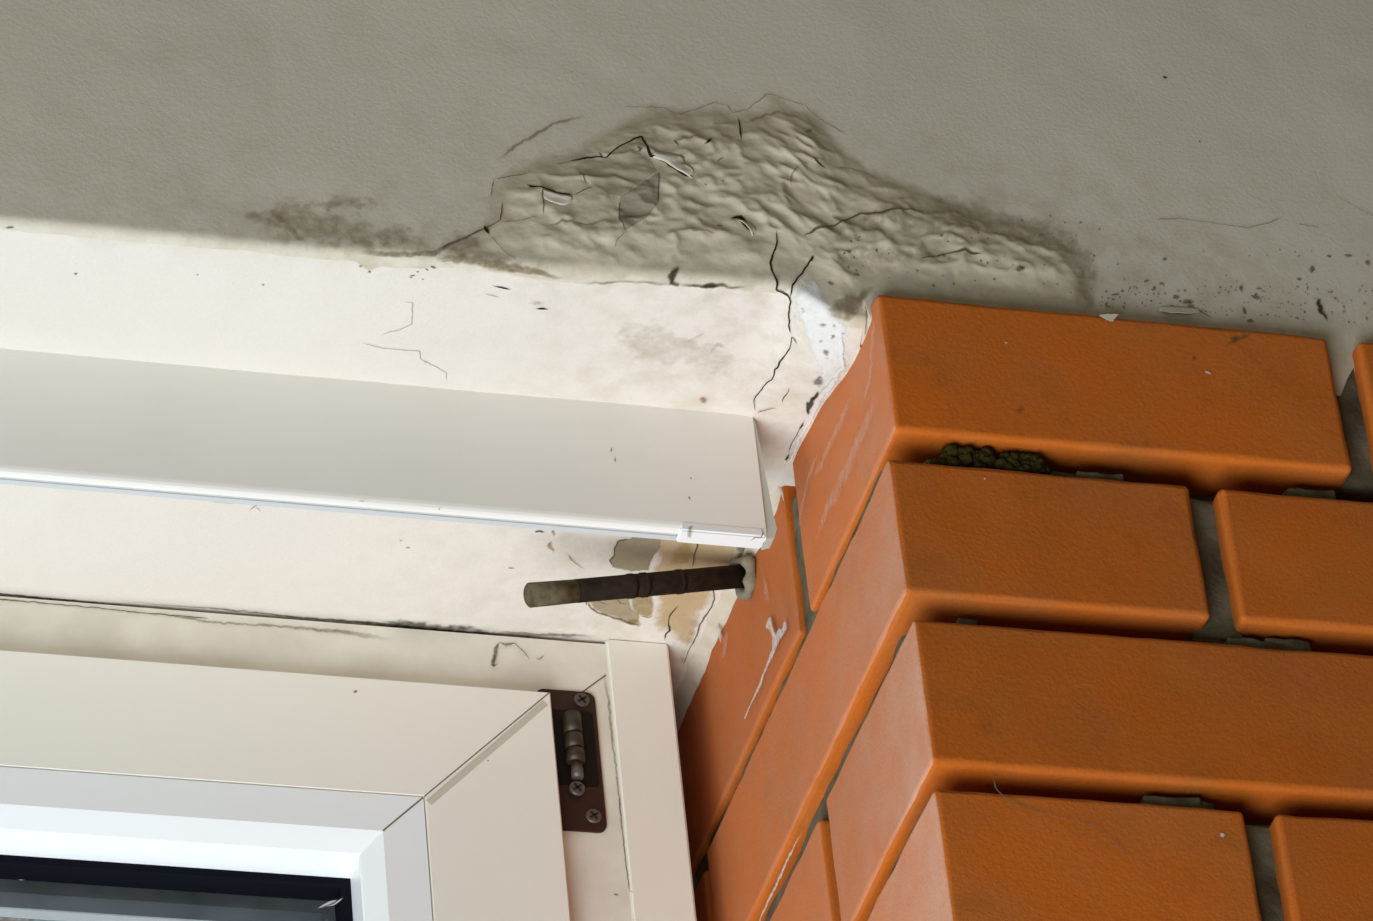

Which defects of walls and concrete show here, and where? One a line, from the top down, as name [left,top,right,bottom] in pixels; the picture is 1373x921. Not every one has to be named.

spalling [576,140,660,229]
water stain [380,244,545,275]
crack [923,248,983,258]
water stain [631,269,737,289]
water stain [1089,251,1373,323]
crack [718,208,923,413]
water stain [787,282,865,465]
spalling [609,537,660,571]
spalling [588,596,652,625]